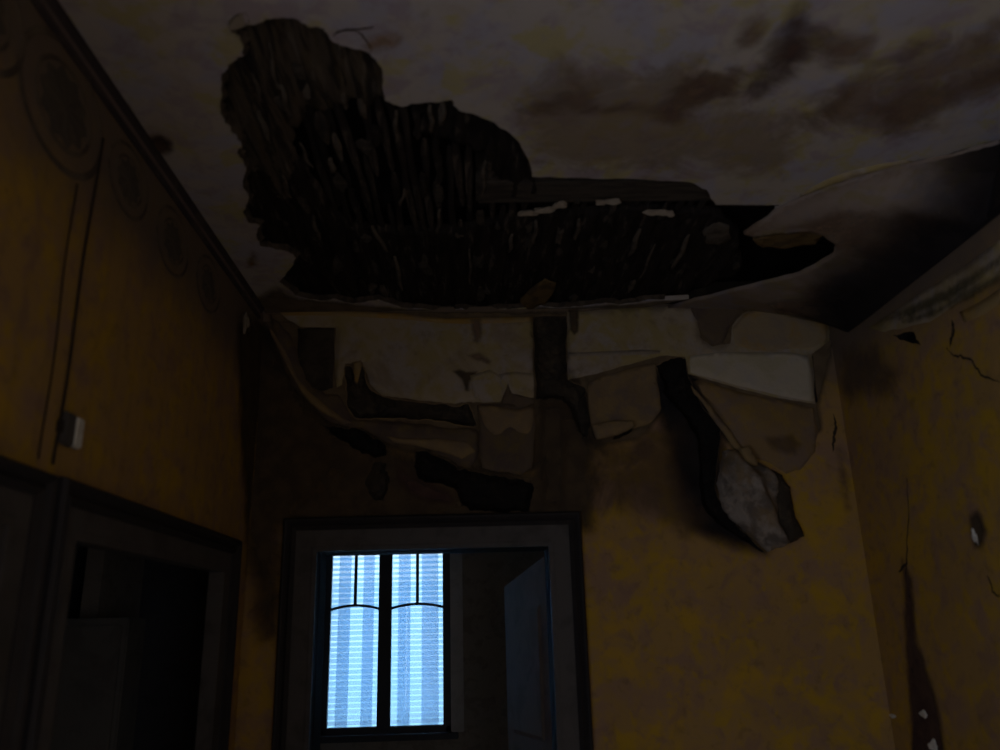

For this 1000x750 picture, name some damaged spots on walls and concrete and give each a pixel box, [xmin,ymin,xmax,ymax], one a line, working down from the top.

leakage [754,18,812,91]
peeling [281,311,535,513]
peeling [567,307,830,554]
crack [947,320,1000,383]